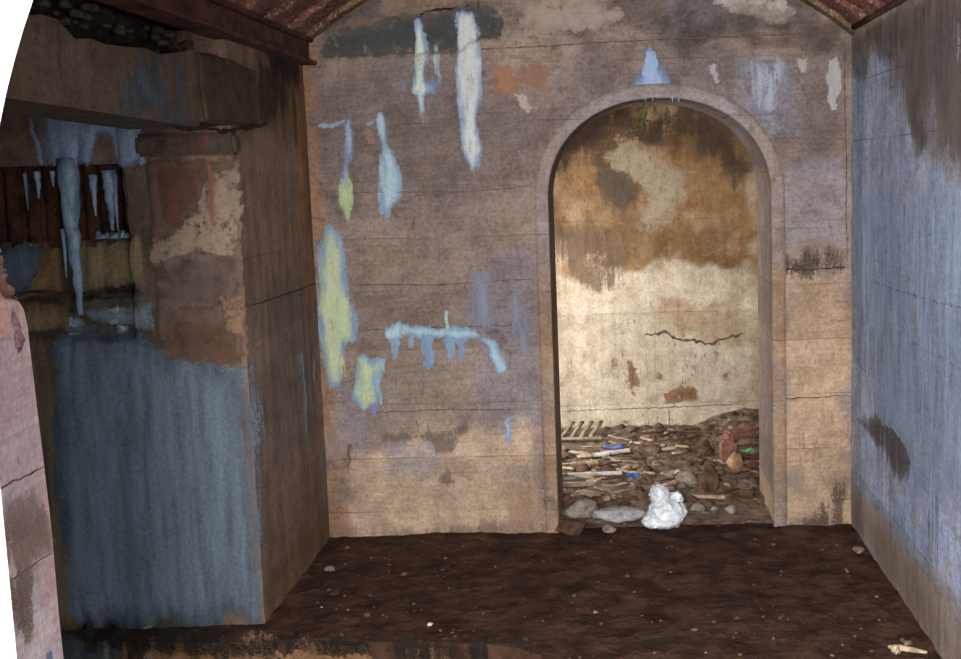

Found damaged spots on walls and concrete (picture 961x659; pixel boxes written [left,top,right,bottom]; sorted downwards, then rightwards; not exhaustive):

spalling [28,0,194,53]
crack [393,0,479,19]
leakage [745,56,807,113]
crack [452,31,848,271]
spalling [0,248,25,353]
flaking render [144,158,250,366]
leakage [554,218,638,294]
crack [644,330,744,346]
leakage [785,0,961,530]
crack [563,404,743,420]
leakage [1,346,70,650]
leakage [787,461,961,659]